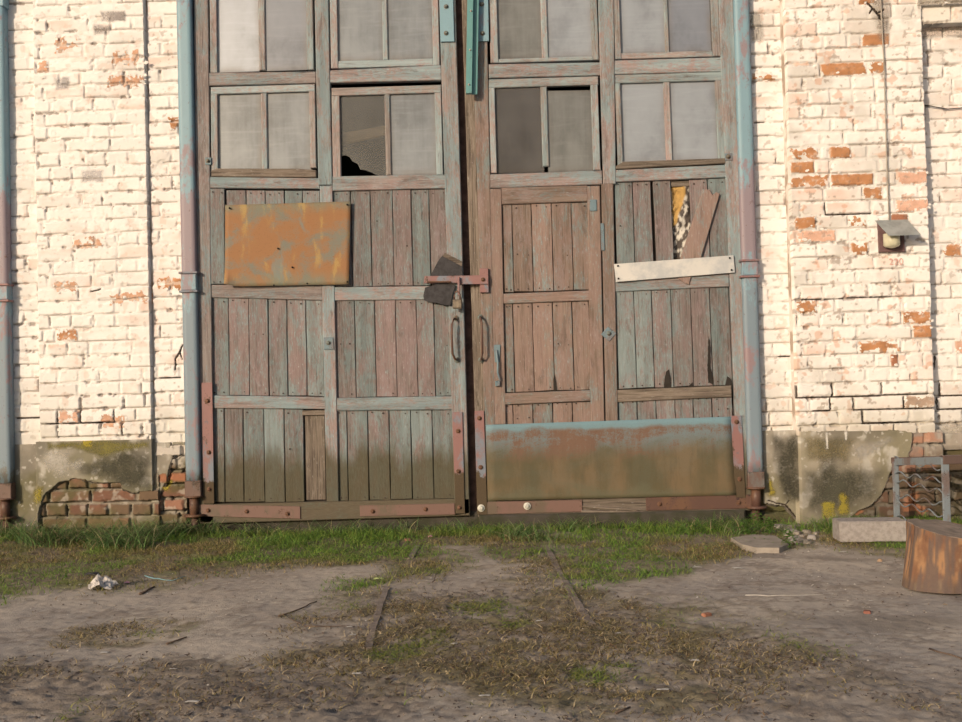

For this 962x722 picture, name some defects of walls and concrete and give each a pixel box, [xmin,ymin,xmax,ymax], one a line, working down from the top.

peeling [860,33,889,47]
peeling [107,49,149,88]
peeling [819,61,886,76]
peeling [788,145,883,200]
peeling [890,199,931,220]
peeling [794,216,836,243]
peeling [849,242,869,256]
peeling [109,276,181,306]
peeling [55,328,80,349]
spalling [36,445,190,534]
leakage [88,454,148,487]
spalling [851,429,943,520]